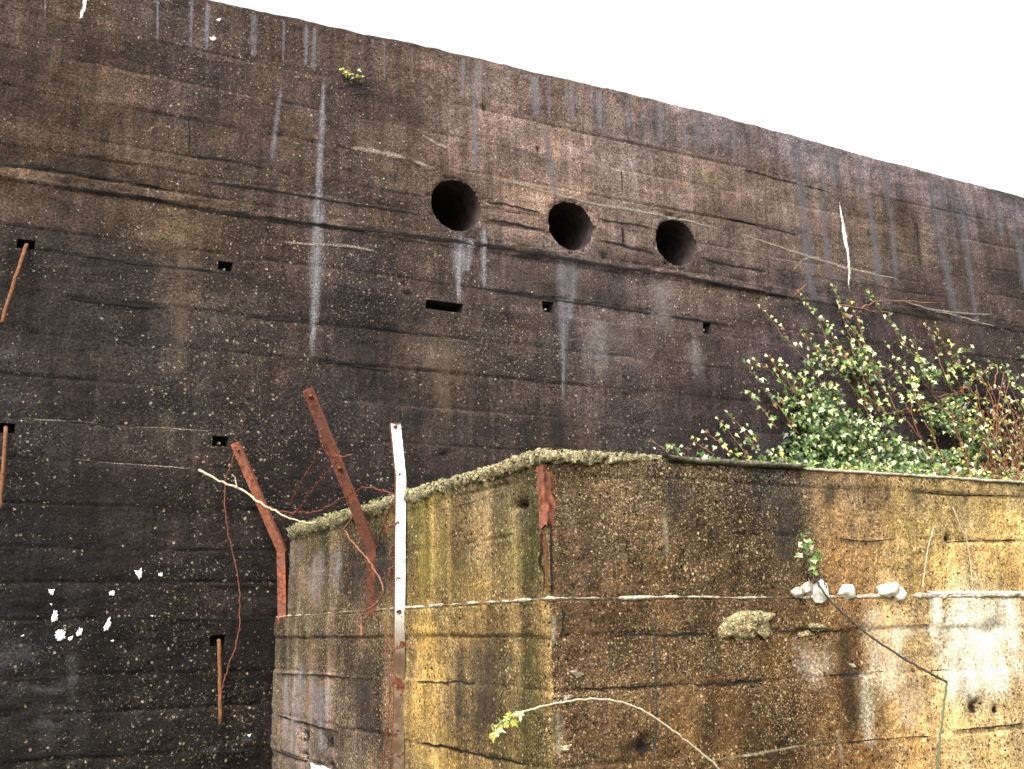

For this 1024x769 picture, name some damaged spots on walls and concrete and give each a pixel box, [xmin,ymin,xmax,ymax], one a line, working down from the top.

water stain [285,103,372,342]
water stain [455,230,486,295]
water stain [925,591,1024,706]